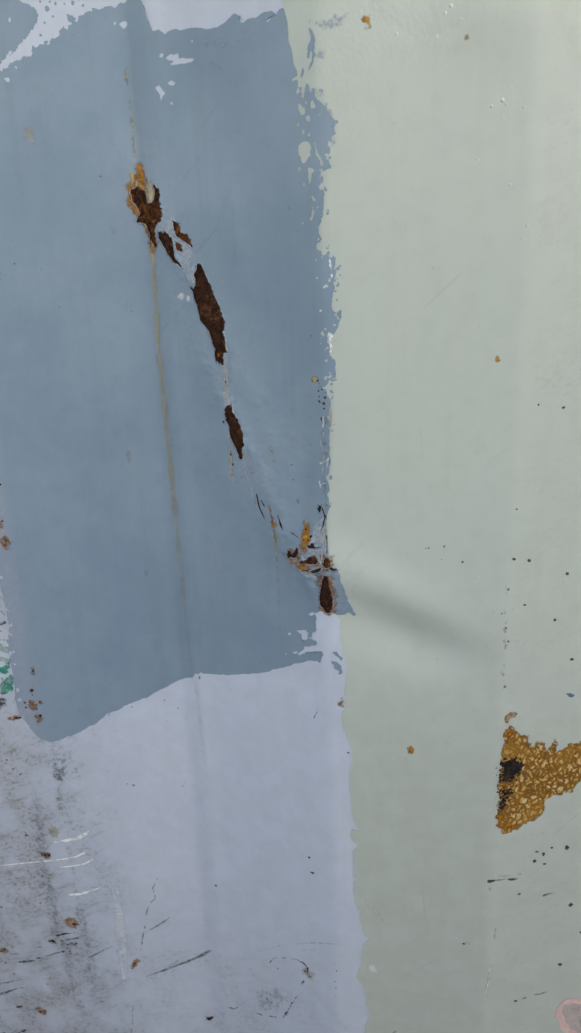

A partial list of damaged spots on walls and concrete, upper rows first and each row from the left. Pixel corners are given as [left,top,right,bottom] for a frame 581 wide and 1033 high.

peeling [0,0,94,82]
peeling [159,53,194,65]
rust [126,163,163,293]
peeling [292,75,342,488]
rust [256,494,337,616]
peeling [285,611,347,677]
rust [495,712,581,834]